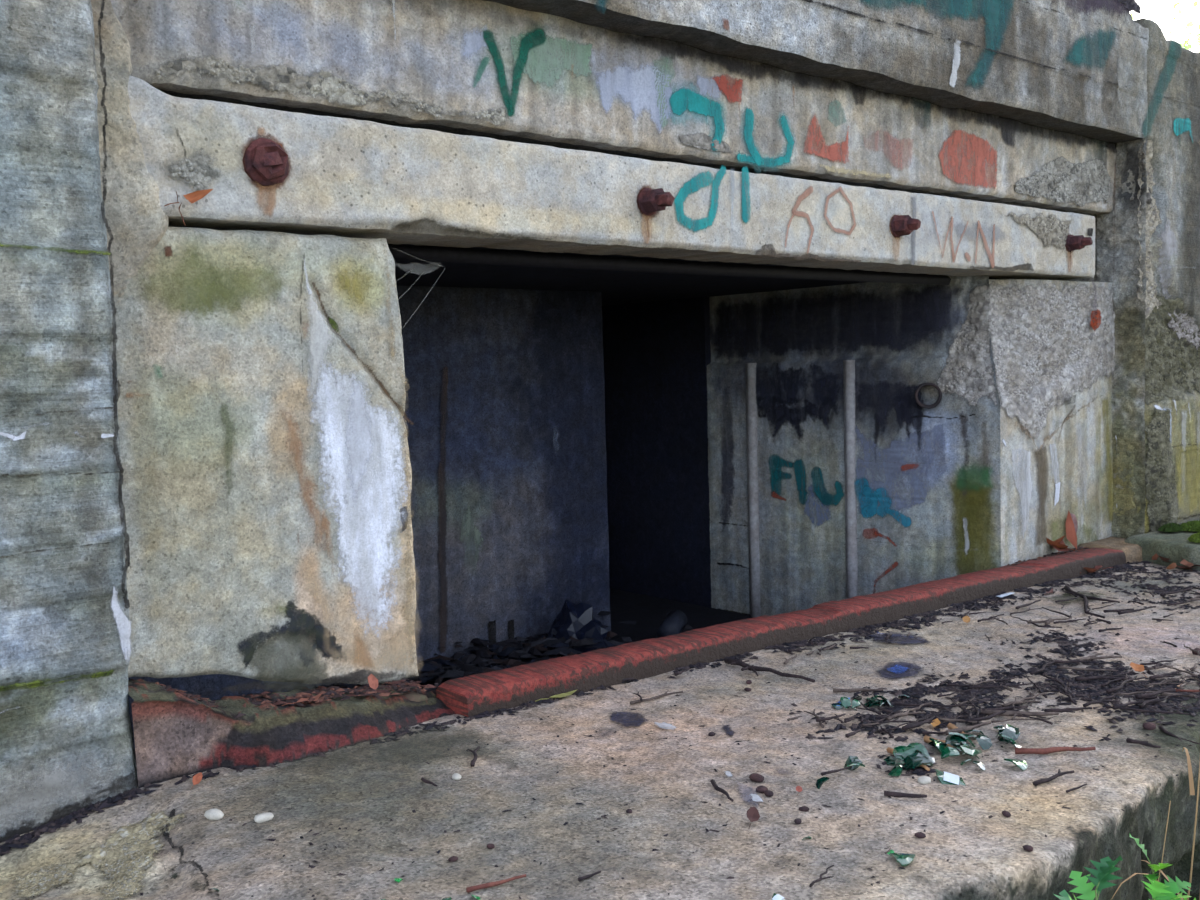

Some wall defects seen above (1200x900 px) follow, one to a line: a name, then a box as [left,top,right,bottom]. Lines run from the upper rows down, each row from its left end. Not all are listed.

rust [243,129,291,214]
rust [638,185,659,241]
spalling [756,244,861,263]
spalling [1000,156,1110,249]
crack [300,254,414,425]
leakage [766,402,831,439]
leakage [903,397,924,443]
spalling [855,263,1115,510]
leakage [1002,406,1075,543]
leakage [238,601,347,667]
crack [151,809,220,900]